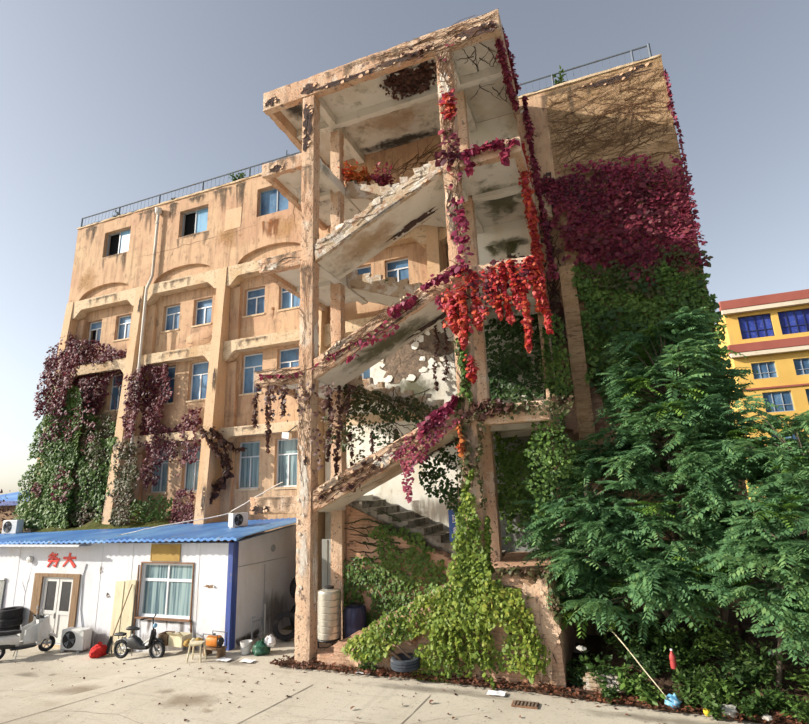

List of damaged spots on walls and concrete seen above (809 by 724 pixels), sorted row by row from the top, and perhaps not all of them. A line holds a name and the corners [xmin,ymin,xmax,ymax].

water stain [215,183,244,207]
water stain [482,187,517,214]
water stain [507,240,518,256]
flaking render [380,310,459,384]